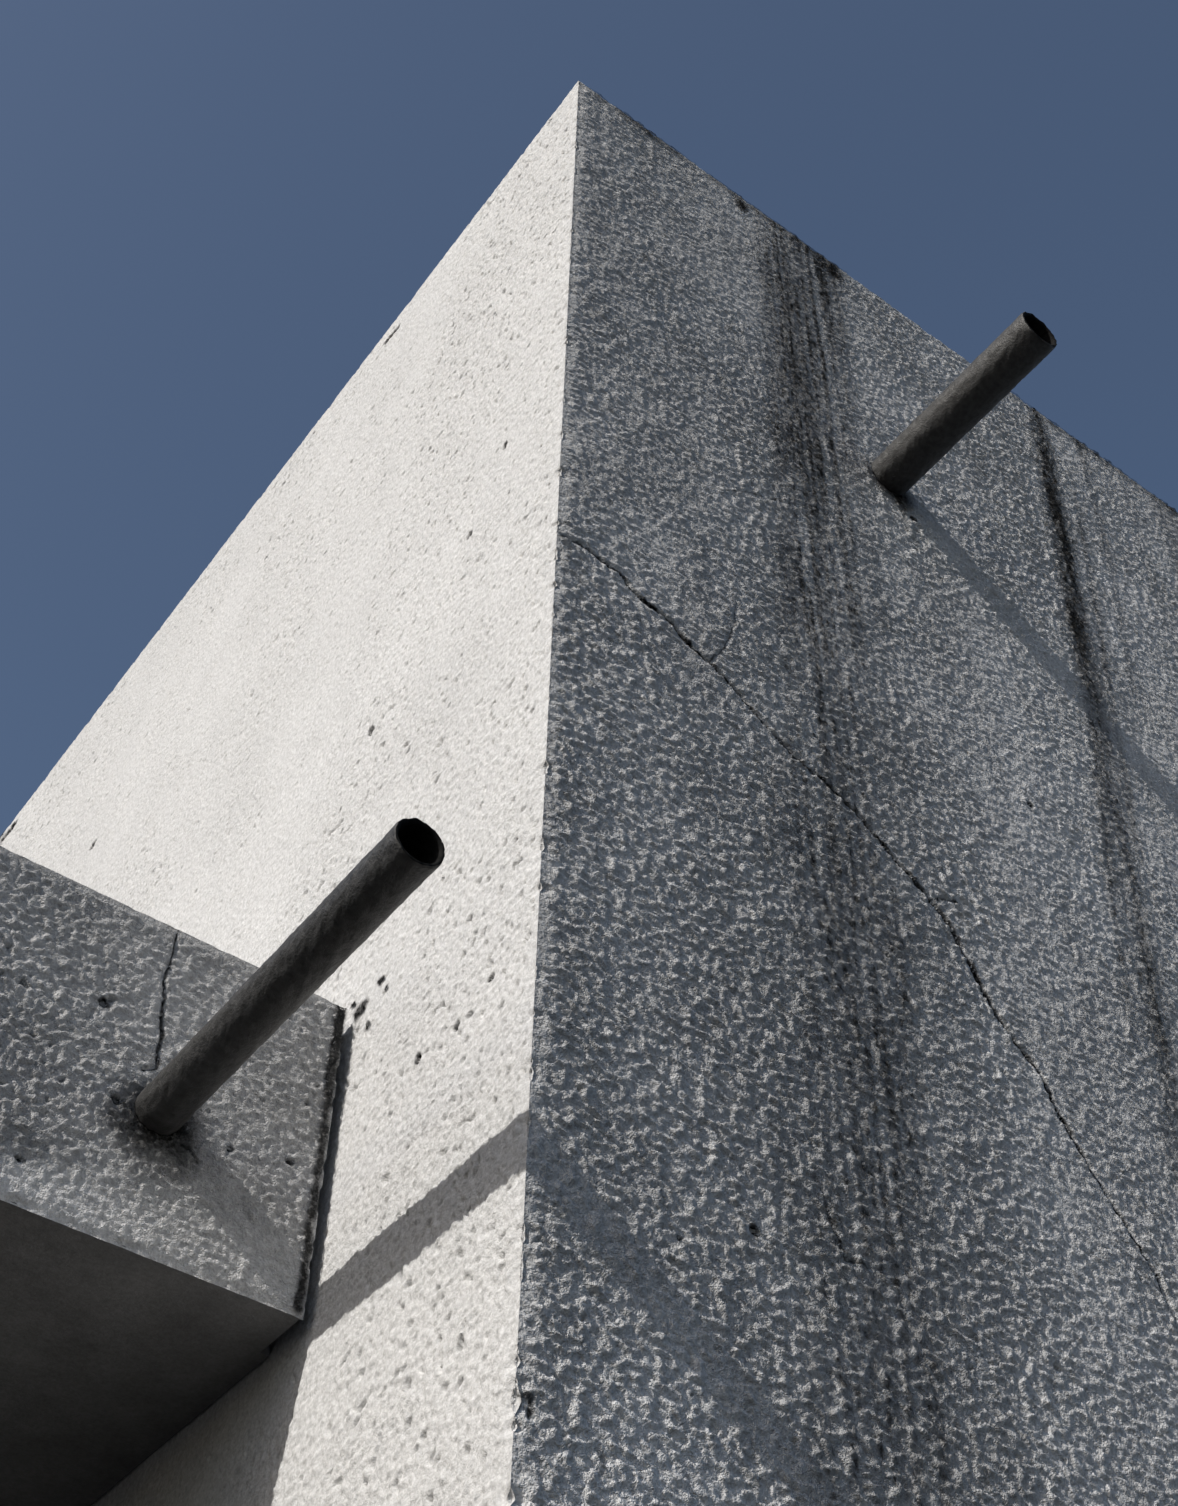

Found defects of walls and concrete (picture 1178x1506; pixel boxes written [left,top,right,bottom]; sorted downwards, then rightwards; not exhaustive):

leakage [758,212,864,757]
leakage [1033,407,1112,752]
crack [141,930,179,1071]
leakage [798,777,921,1295]
crack [556,532,1169,1309]
leakage [1094,773,1177,1112]
leakage [837,1329,939,1458]